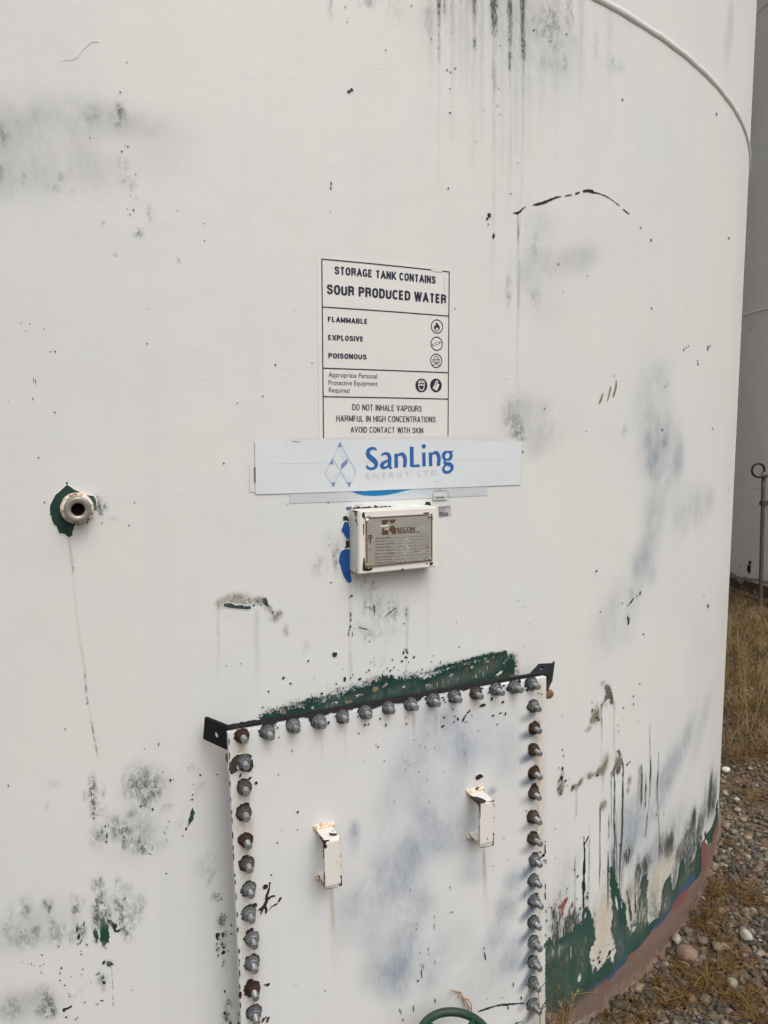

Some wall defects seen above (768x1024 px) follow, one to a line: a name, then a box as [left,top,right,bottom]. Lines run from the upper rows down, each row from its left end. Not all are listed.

damp [489,0,526,69]
crack [514,189,652,241]
peeling [44,482,106,538]
peeling [218,593,282,620]
peeling [612,750,631,791]
damp [638,748,664,844]
peeling [214,646,543,1024]
peeling [513,765,719,1024]